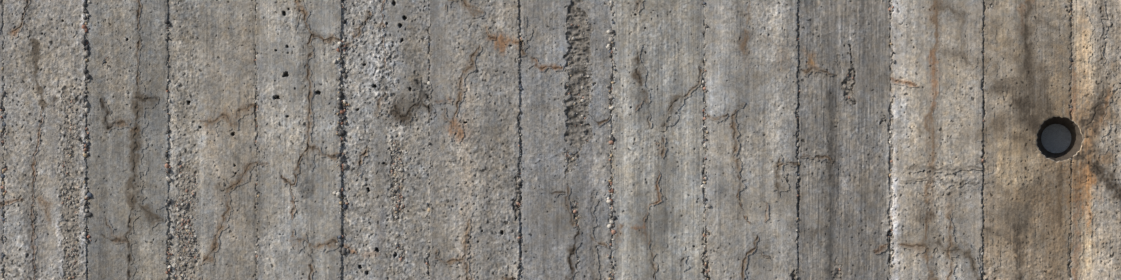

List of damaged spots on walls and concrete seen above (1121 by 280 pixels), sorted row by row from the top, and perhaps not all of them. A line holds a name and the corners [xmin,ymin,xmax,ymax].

crack [0,106,44,280]
crack [198,0,564,280]
crack [591,44,836,280]
water stain [934,0,1121,280]